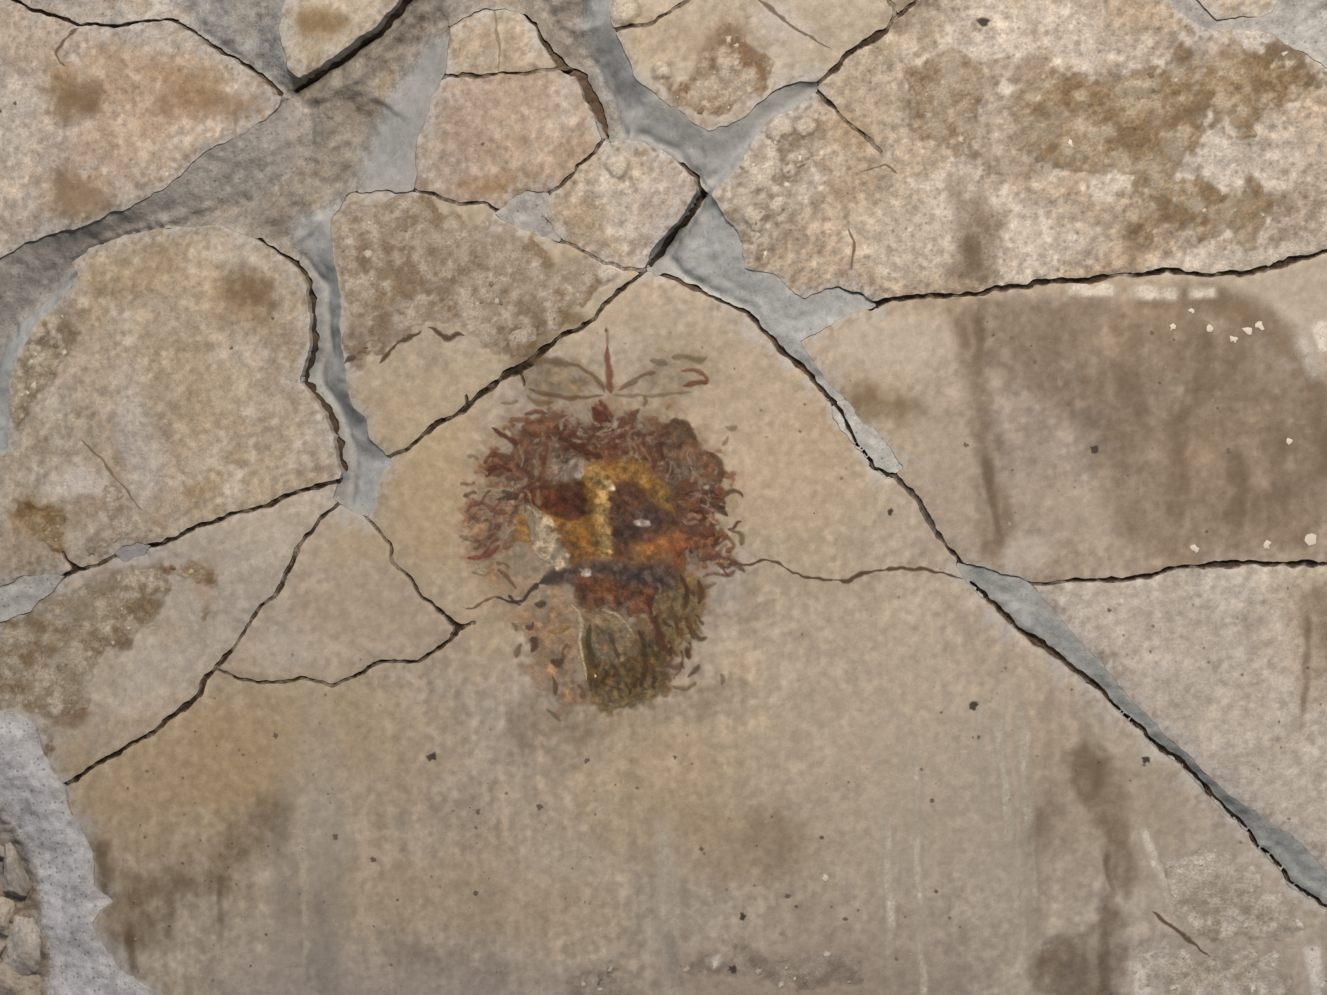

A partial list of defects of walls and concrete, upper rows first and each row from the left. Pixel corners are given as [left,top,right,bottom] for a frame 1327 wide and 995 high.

crack [12,0,413,97]
crack [443,10,609,194]
crack [615,0,691,32]
crack [759,0,919,173]
water stain [1066,282,1327,477]
crack [62,238,576,785]
crack [388,163,1327,907]
crack [1152,911,1215,961]